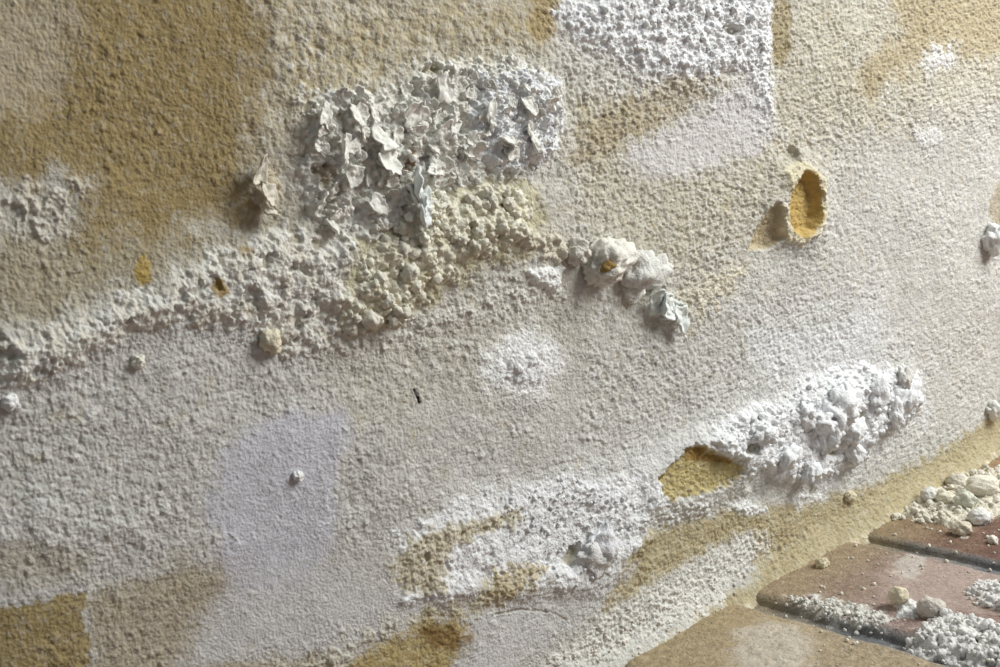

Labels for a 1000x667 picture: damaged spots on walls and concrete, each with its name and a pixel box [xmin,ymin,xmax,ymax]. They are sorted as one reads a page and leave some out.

leakage [0,0,798,418]
peeling [247,38,568,253]
spalling [747,146,830,253]
leakage [0,536,207,667]
spalling [561,540,581,569]
leakage [254,352,1000,667]
spalling [658,442,763,505]